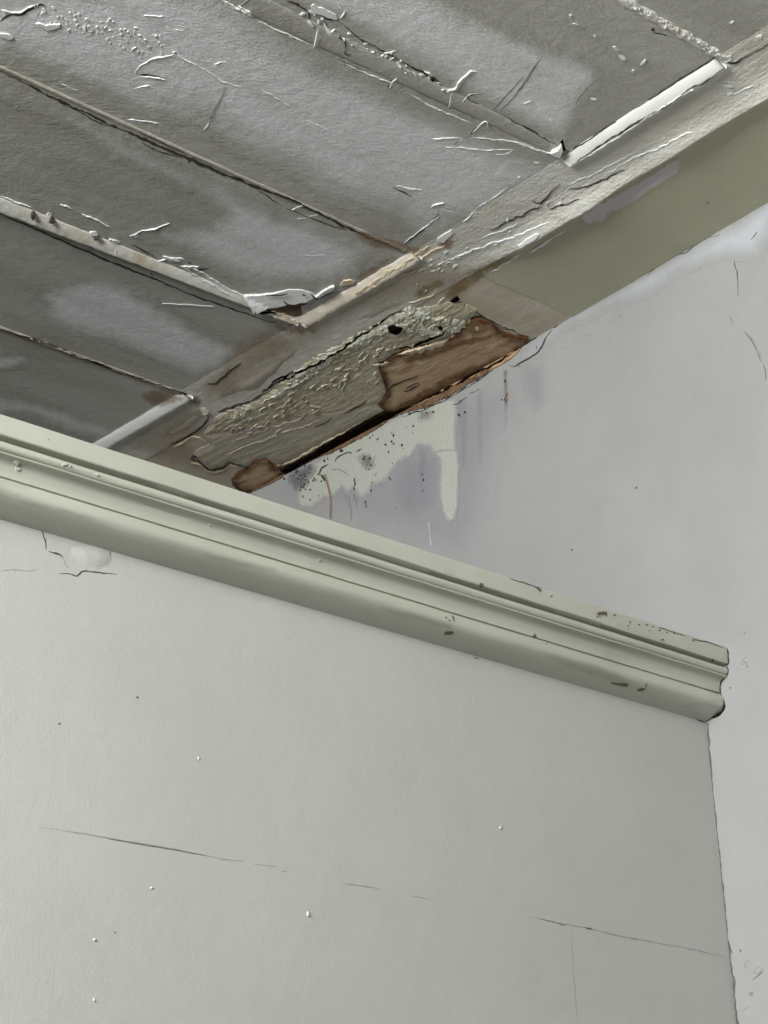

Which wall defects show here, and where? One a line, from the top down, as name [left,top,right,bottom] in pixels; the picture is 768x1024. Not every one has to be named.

peeling [0,4,240,130]
peeling [222,0,563,164]
peeling [570,131,694,185]
peeling [574,79,754,163]
peeling [627,2,731,60]
peeling [0,190,565,522]
water stain [257,371,528,564]
crack [42,531,112,577]